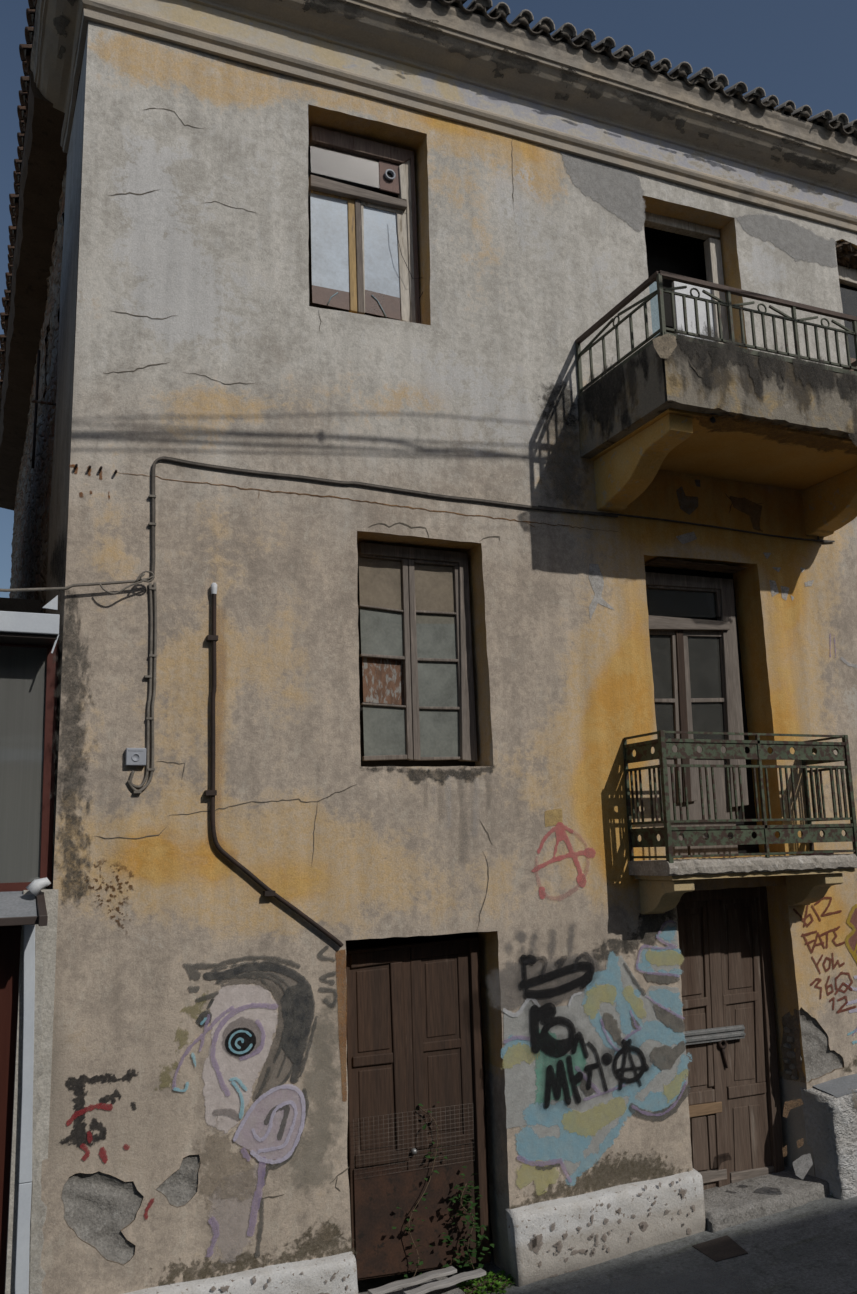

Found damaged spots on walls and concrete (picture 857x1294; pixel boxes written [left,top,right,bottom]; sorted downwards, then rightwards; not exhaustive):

peeling [395,12,541,78]
peeling [554,66,768,139]
peeling [770,137,851,175]
damp [678,325,857,407]
damp [543,353,647,503]
damp [697,415,857,455]
damp [50,535,94,900]
crack [97,784,357,861]
spalling [781,1007,844,1083]
spalling [783,1099,803,1118]
spalling [62,1154,201,1265]